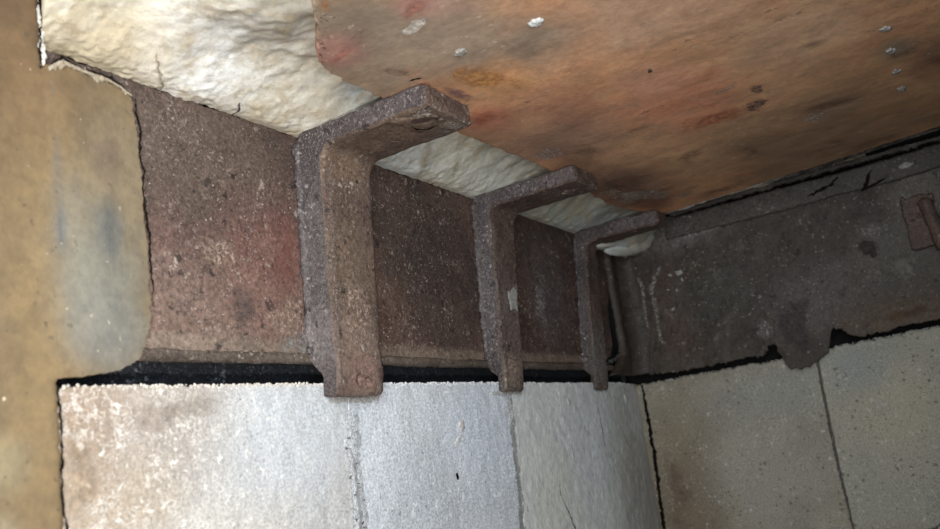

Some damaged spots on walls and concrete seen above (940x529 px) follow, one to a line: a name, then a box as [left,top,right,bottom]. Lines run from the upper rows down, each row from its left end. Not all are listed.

crack [38,0,154,304]
crack [808,176,838,196]
crack [861,169,886,191]
crack [816,361,854,529]